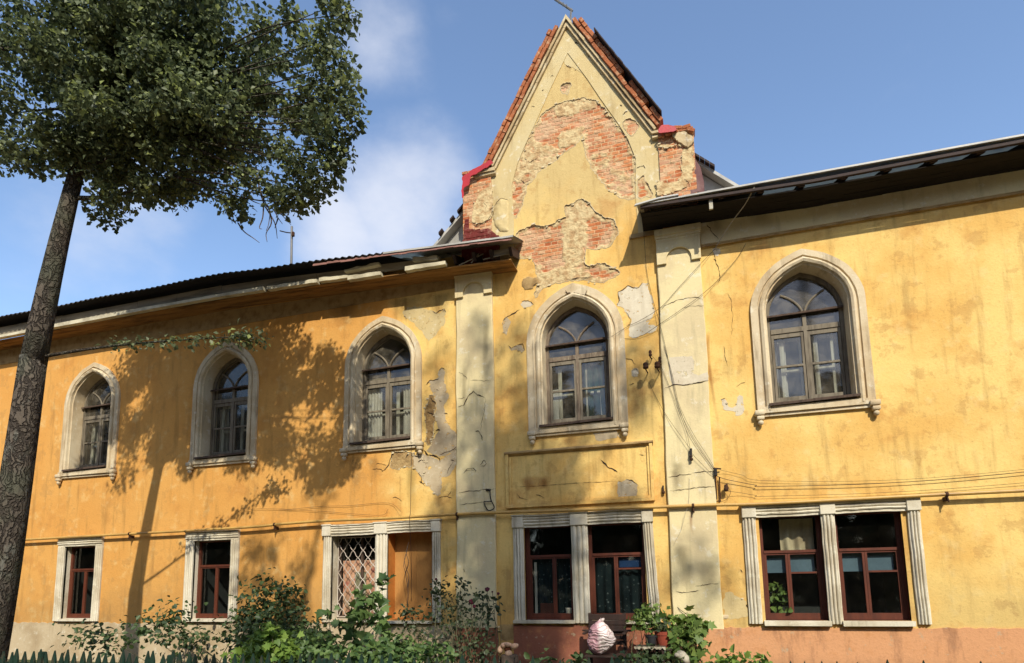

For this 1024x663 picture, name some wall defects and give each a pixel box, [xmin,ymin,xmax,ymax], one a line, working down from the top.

spalling [472,187,494,224]
spalling [512,82,695,308]
peeling [403,306,446,340]
peeling [617,283,658,338]
peeling [390,368,457,496]
crack [377,368,493,505]
peeling [721,395,745,416]
peeling [617,479,638,497]